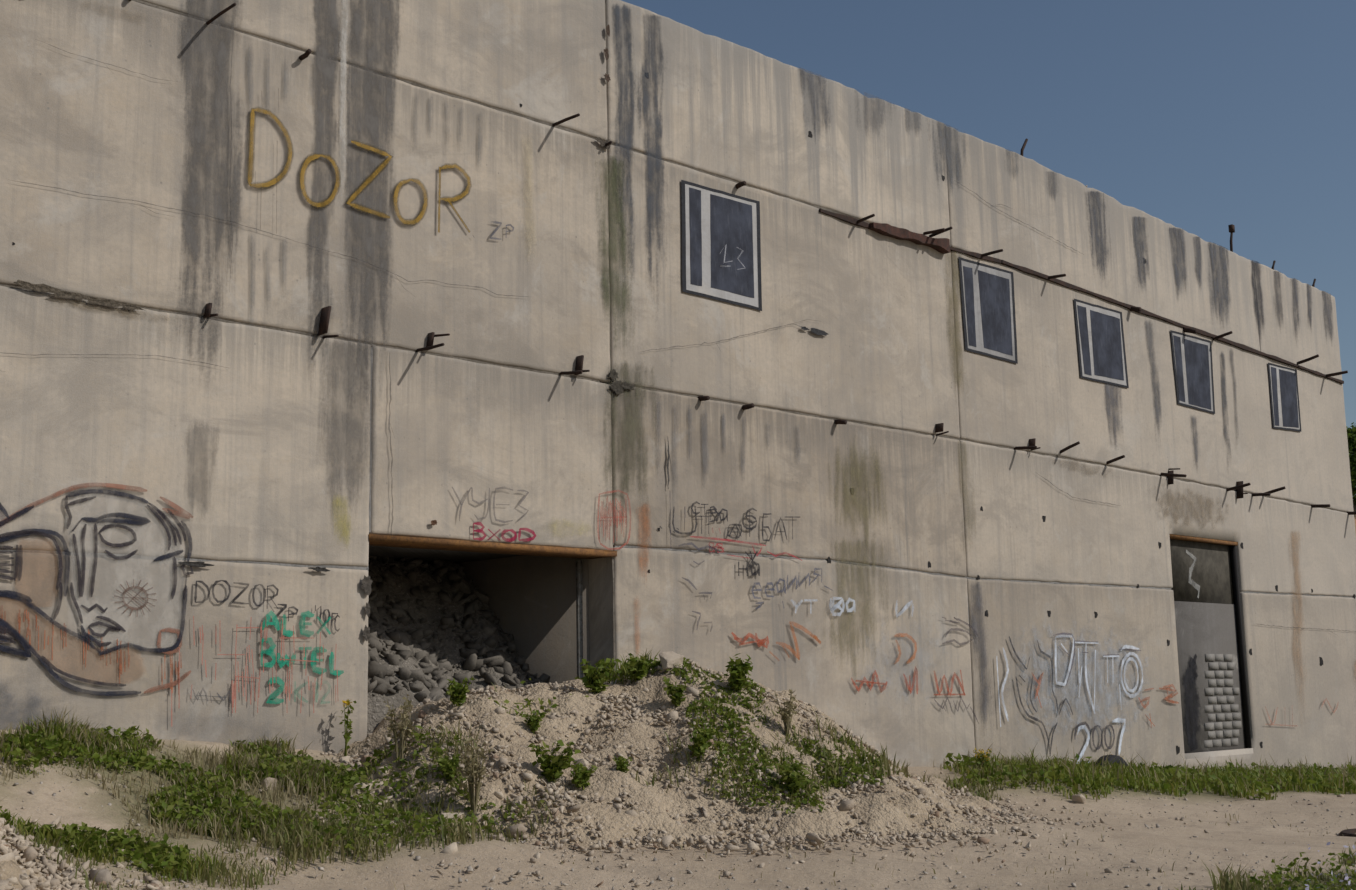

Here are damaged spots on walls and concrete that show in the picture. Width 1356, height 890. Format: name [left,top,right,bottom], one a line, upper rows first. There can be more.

leakage [181,0,241,305]
crack [12,46,525,297]
leakage [308,0,399,368]
leakage [614,5,663,275]
leakage [936,125,961,184]
leakage [1088,191,1106,272]
leakage [1133,216,1149,284]
leakage [1170,228,1230,318]
leakage [1252,260,1332,337]